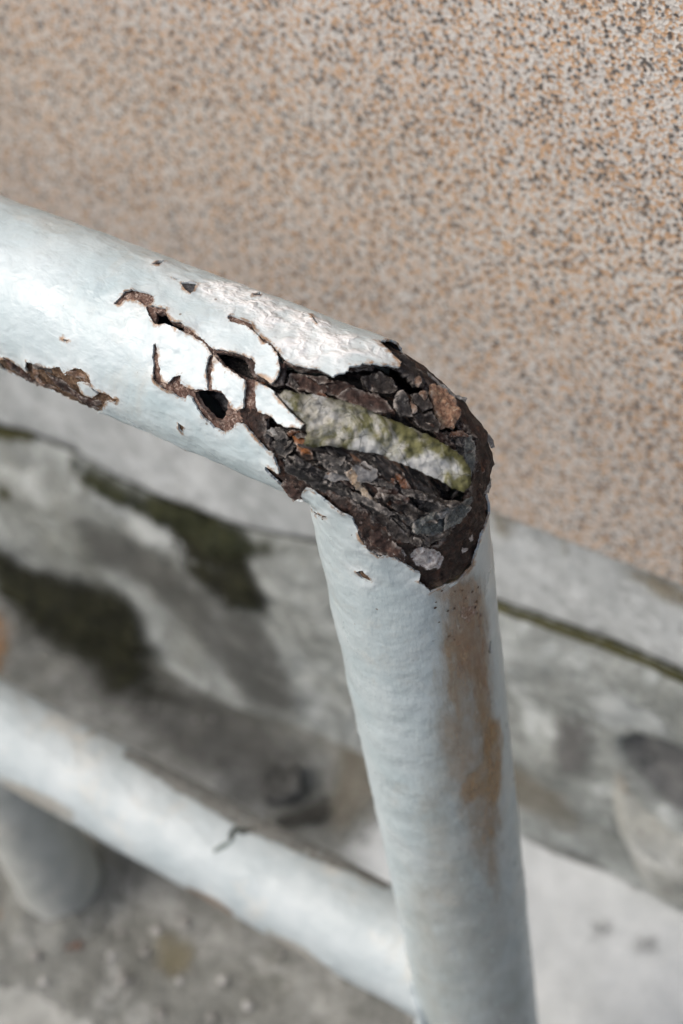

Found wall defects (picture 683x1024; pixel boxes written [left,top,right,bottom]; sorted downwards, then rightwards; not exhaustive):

peeling [255,382,305,429]
corrosion [188,342,495,589]